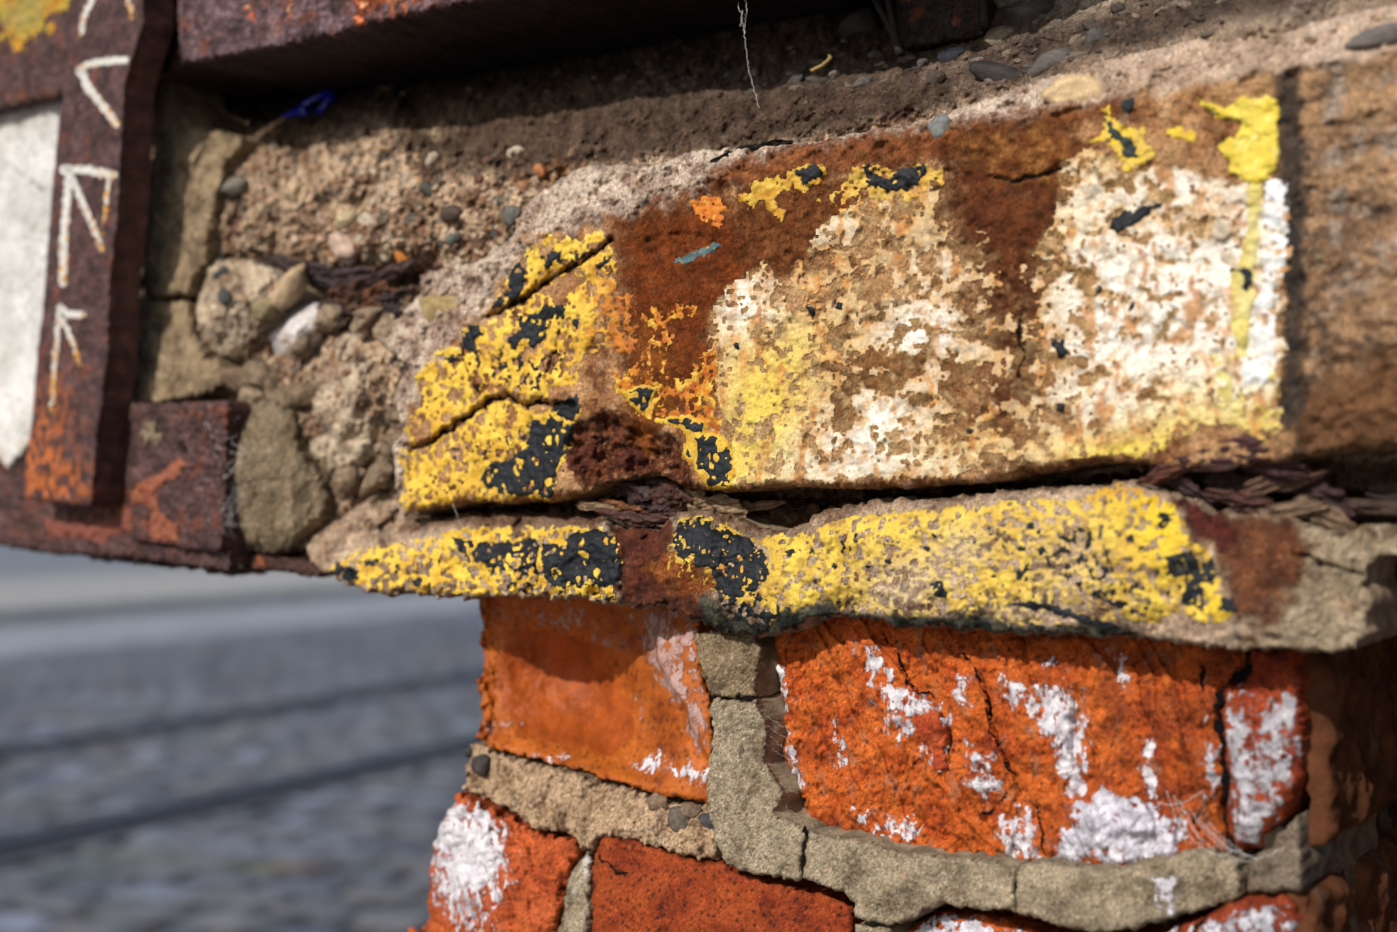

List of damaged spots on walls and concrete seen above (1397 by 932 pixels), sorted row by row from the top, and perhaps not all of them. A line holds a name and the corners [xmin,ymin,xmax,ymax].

corrosion [354,0,420,27]
crack [489,239,613,317]
crack [401,333,560,450]
leakage [504,594,1131,800]
leakage [994,673,1189,864]
leakage [1199,683,1303,847]
leakage [851,806,921,843]
leakage [431,801,518,932]
leakage [571,852,592,895]
leakage [915,913,1022,932]
leakage [1152,876,1298,932]